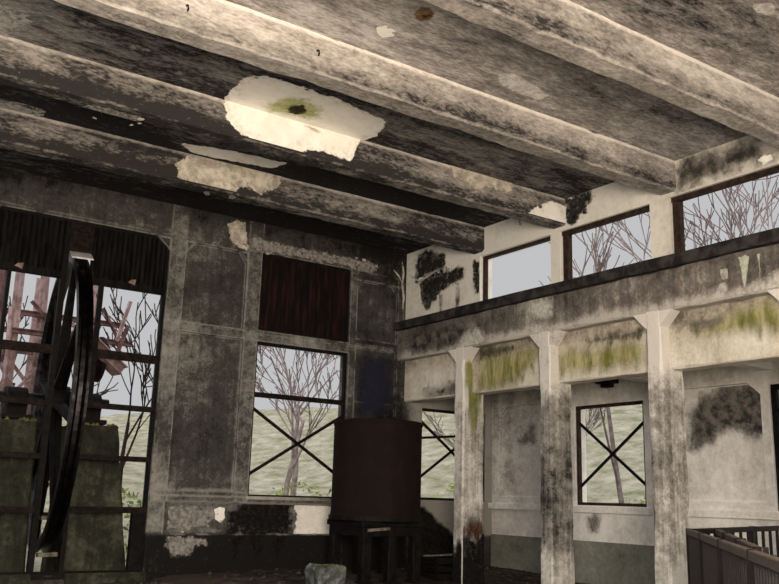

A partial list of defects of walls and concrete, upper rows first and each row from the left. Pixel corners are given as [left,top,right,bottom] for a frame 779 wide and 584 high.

rust [415,7,434,21]
peeling [223,76,386,161]
peeling [175,143,286,199]
mould [565,191,593,226]
peeling [227,220,378,273]
mould [415,250,479,311]
peeling [165,505,225,556]